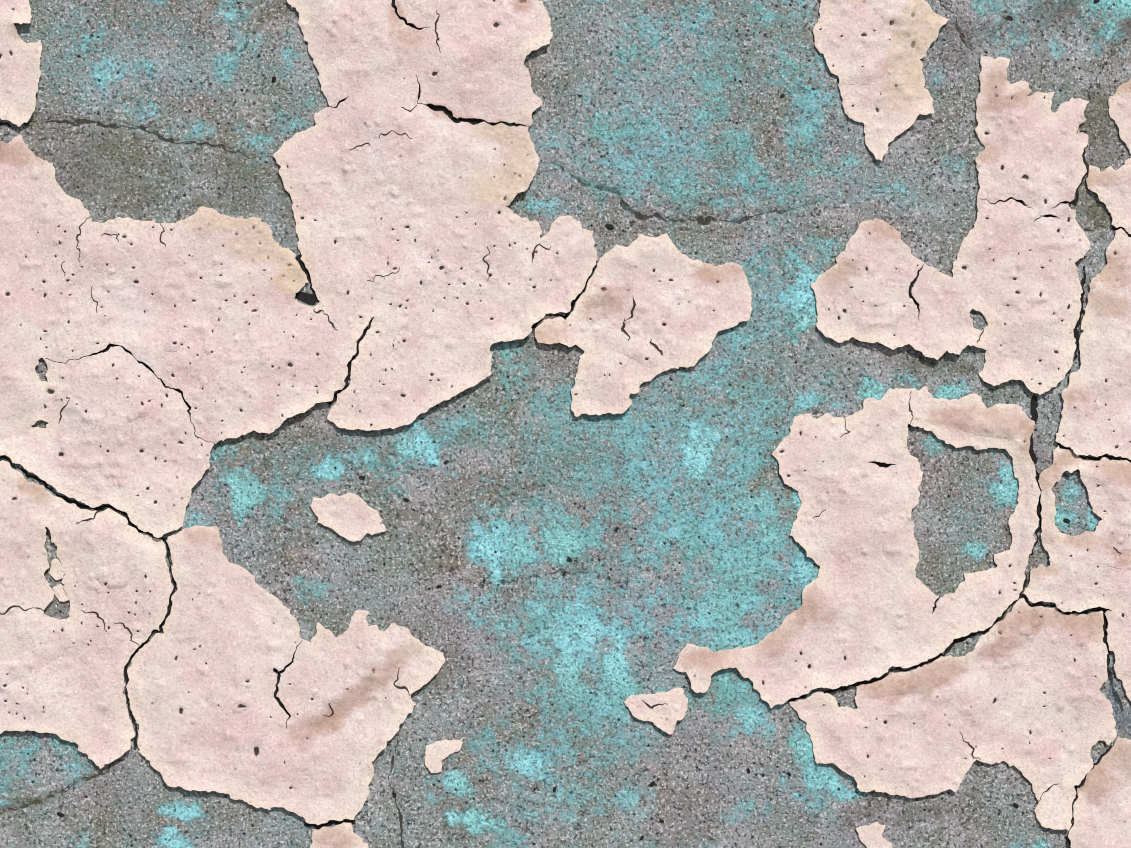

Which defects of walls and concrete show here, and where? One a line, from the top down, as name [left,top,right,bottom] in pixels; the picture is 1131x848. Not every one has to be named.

crack [391,0,441,52]
crack [350,76,531,150]
peeling [812,0,949,161]
crack [994,131,1131,237]
crack [1067,266,1086,374]
crack [46,344,214,443]
peeling [0,0,752,848]
peeling [624,56,1131,848]
crack [788,395,1131,712]
crack [0,455,177,815]
crack [304,819,355,829]
crack [1036,745,1112,848]